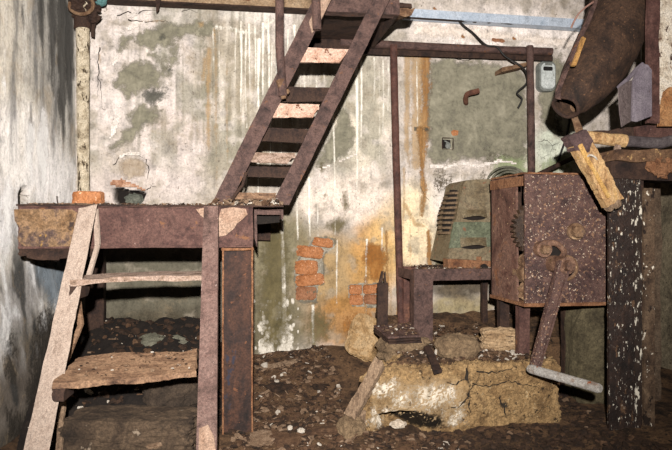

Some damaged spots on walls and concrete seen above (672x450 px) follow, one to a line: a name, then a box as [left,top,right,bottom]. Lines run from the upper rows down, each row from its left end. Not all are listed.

water stain [38,0,75,137]
water stain [213,15,277,109]
rust [404,56,432,212]
water stain [3,181,11,233]
water stain [259,224,291,345]
spalling [294,236,336,304]
water stain [307,305,329,345]
spalling [348,281,384,308]
rust [362,228,389,286]
crack [447,366,546,415]